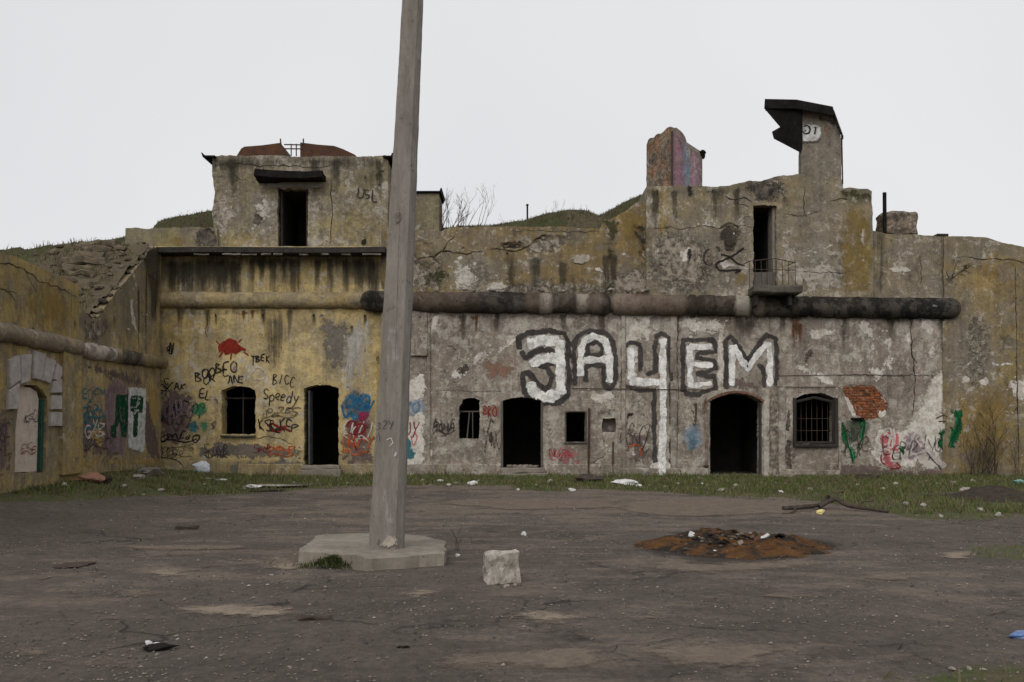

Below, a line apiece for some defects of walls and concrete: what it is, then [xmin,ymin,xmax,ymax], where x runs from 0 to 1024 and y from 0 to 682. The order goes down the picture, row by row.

damp [128,247,300,338]
spalling [193,190,283,256]
crack [220,162,334,246]
damp [315,257,384,291]
crack [398,230,598,265]
peeling [773,318,948,476]
crack [839,321,940,415]